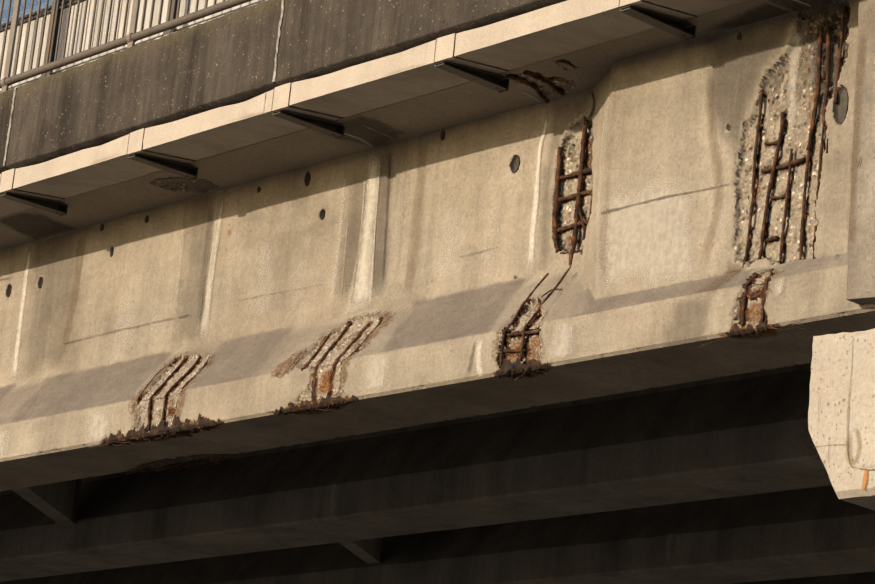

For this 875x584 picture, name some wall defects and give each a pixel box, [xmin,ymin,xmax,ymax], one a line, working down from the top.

spalling [506,59,578,103]
spalling [699,0,850,348]
spalling [492,116,594,381]
spalling [90,353,224,449]
spalling [272,311,395,417]